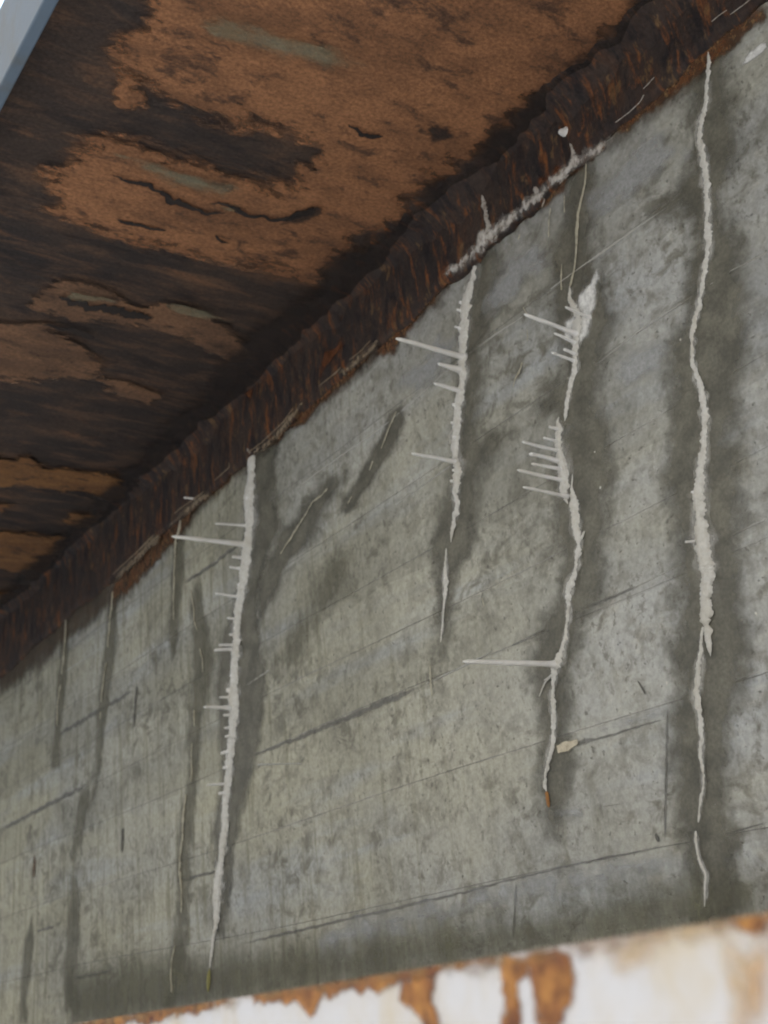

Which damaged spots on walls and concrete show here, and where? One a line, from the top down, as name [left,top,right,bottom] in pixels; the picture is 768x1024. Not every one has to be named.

rust [0,280,243,406]
rust [74,999,229,1024]
crack [172,455,257,992]
leakage [0,0,654,609]
rust [33,0,634,285]
leakage [64,587,750,1021]
rust [252,942,589,1024]
crack [396,265,477,642]
crack [462,164,592,807]
leakage [431,77,671,834]
crack [685,52,716,907]
leakage [657,52,750,897]